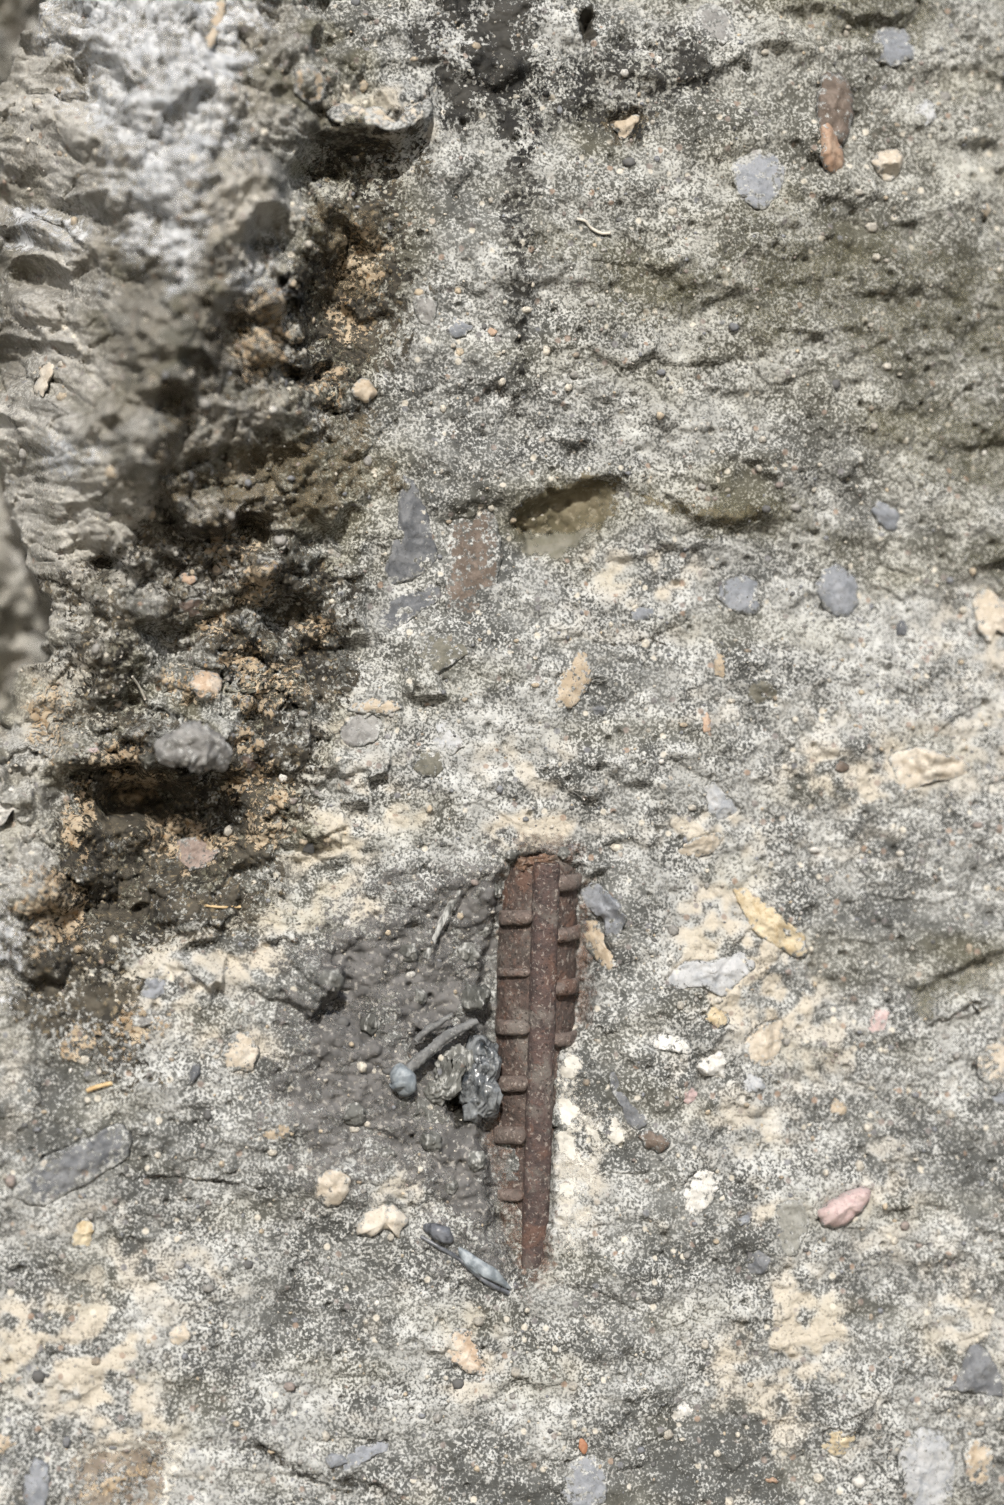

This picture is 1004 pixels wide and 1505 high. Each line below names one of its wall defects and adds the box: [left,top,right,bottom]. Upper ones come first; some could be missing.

water stain [0,0,718,1100]
spalling [246,829,545,1296]
rust [485,833,596,1282]
peeling [554,1053,627,1254]